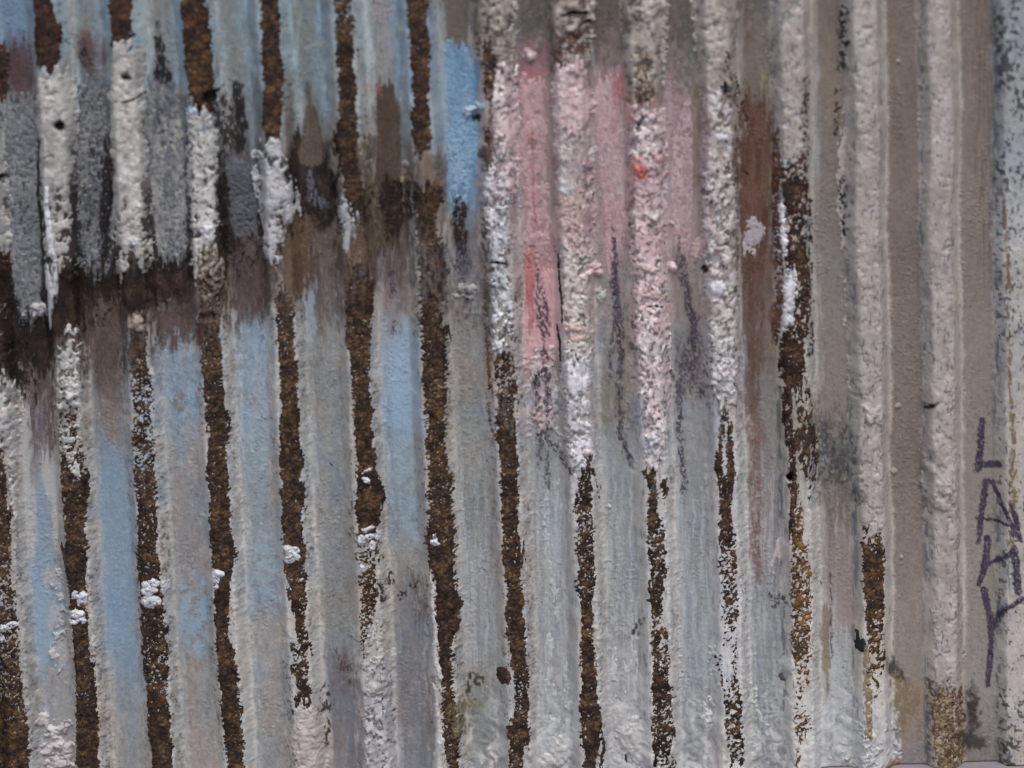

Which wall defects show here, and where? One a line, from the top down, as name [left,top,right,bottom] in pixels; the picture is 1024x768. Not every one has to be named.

corrosion [258,0,286,144]
corrosion [333,0,371,228]
corrosion [0,439,32,768]
corrosion [57,387,101,768]
corrosion [127,330,175,768]
corrosion [198,299,246,768]
corrosion [273,280,314,715]
corrosion [342,254,386,659]
corrosion [410,177,531,768]
corrosion [572,455,606,768]
corrosion [642,466,677,768]
corrosion [714,88,832,768]